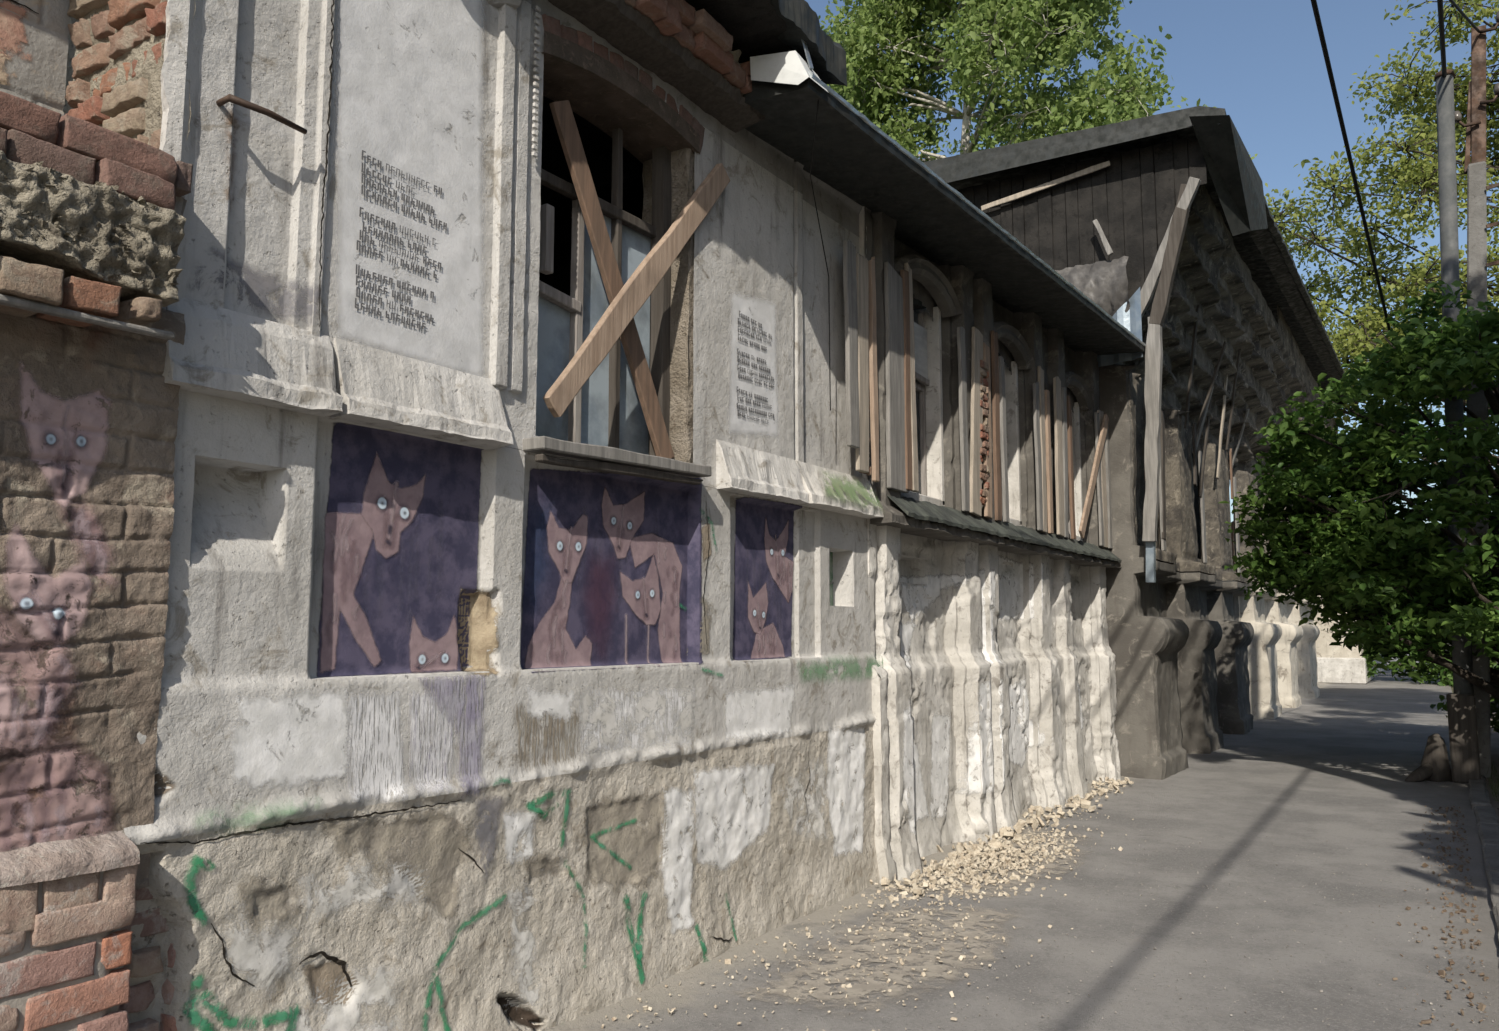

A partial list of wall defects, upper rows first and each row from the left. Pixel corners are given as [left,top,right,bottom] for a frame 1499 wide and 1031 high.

peeling [0,0,31,85]
spalling [458,588,499,676]
crack [211,923,255,986]
crack [299,951,352,987]
spalling [225,810,470,1031]